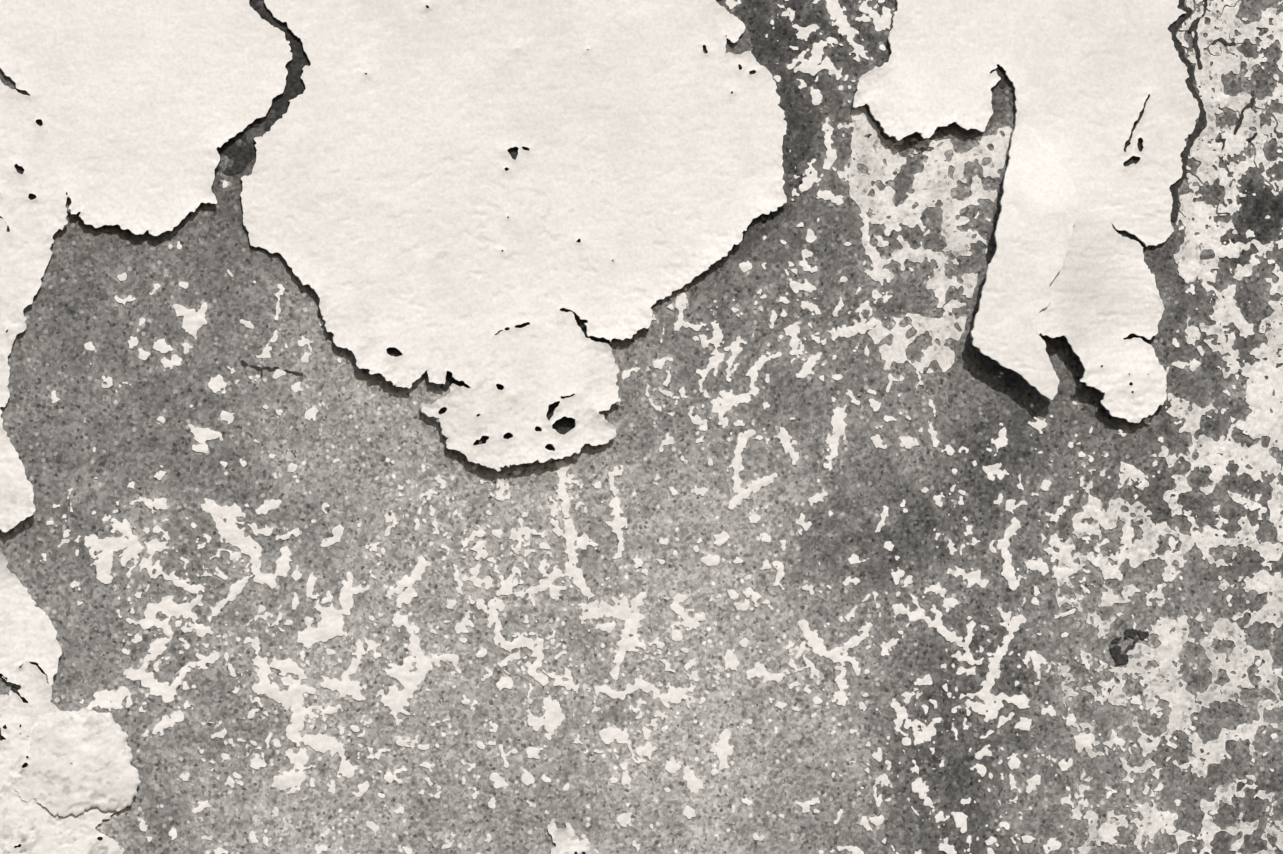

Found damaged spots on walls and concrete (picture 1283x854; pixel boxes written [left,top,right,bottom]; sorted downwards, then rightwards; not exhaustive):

crack [217,0,310,175]
crack [1168,0,1258,221]
peeling [769,222,823,329]
peeling [128,302,207,371]
peeling [208,284,313,394]
peeling [188,411,235,454]
peeling [823,389,911,472]
peeling [972,423,1010,481]
peeling [46,474,461,814]
peeling [0,552,122,854]
peeling [907,760,1035,854]
peeling [997,746,1073,806]